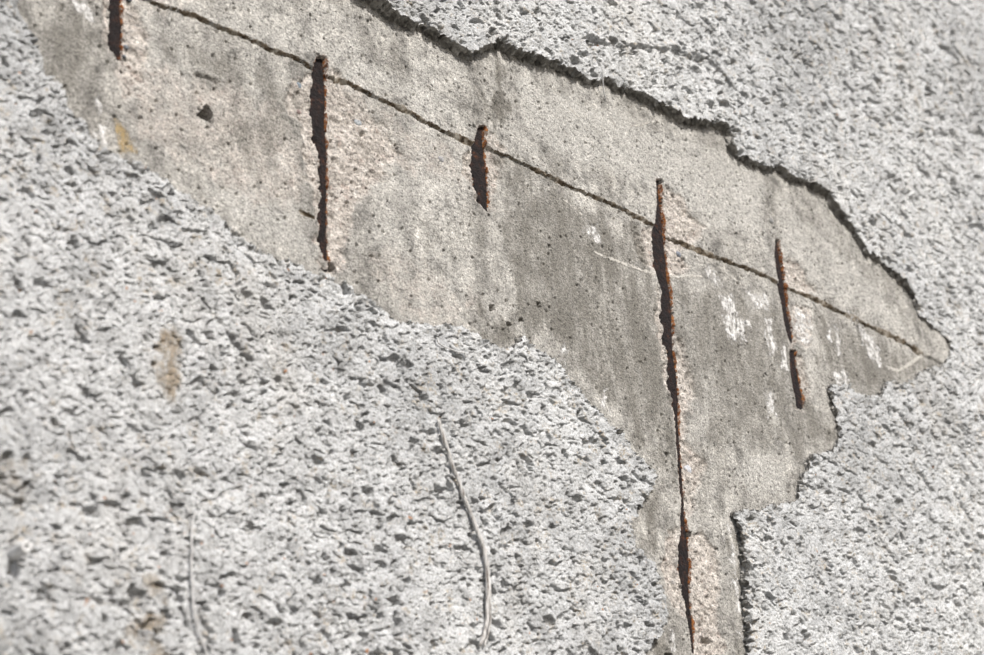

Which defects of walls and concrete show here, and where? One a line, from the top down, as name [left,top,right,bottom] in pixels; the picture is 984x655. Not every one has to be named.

rust [107,0,124,74]
spalling [283,72,322,218]
rust [309,57,331,272]
spalling [314,54,404,276]
rust [469,126,490,212]
crack [143,0,924,355]
peeling [603,76,918,309]
rust [651,181,695,653]
spalling [672,334,708,520]
rust [774,240,806,410]
peeling [645,527,693,655]
spalling [687,531,727,655]